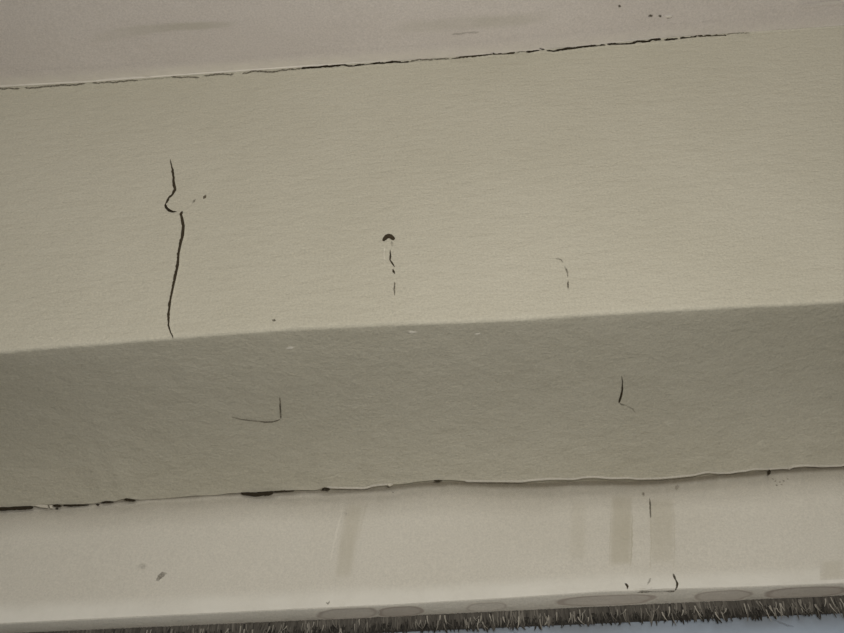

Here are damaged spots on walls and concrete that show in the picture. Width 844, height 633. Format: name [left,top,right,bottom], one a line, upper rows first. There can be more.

crack [172,34,727,78]
crack [0,80,138,90]
crack [164,159,206,338]
crack [262,400,282,423]
crack [241,489,294,497]
crack [0,504,33,512]
crack [53,498,136,510]